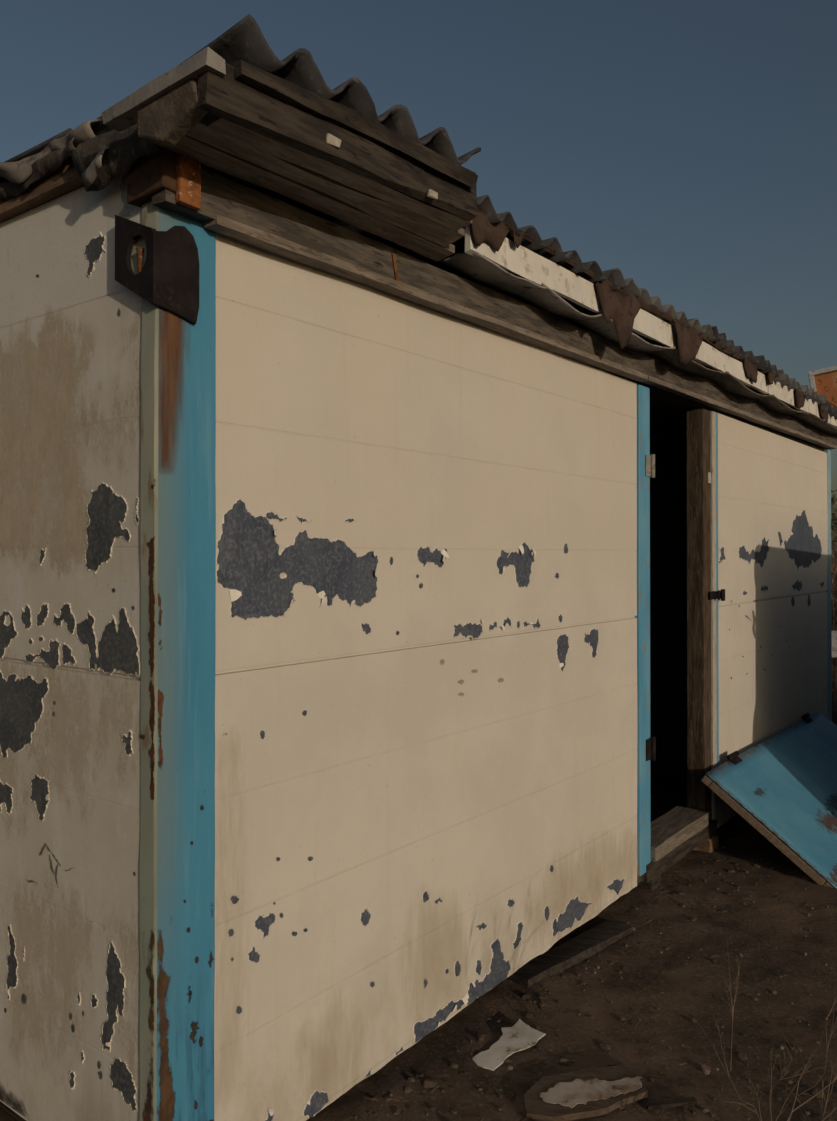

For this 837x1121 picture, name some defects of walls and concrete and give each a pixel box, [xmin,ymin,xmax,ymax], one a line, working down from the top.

damp [0,316,135,574]
rust [160,308,182,468]
peeling [85,482,141,574]
peeling [216,498,393,621]
peeling [495,541,536,588]
peeling [718,508,824,608]
peeling [0,602,141,759]
rust [140,536,164,801]
peeling [69,940,138,1112]
rust [143,931,175,1121]
peeling [394,921,524,1056]
peeling [543,895,592,939]